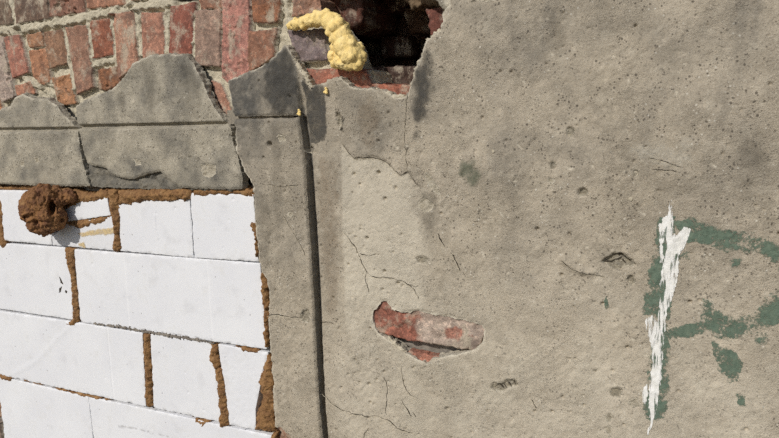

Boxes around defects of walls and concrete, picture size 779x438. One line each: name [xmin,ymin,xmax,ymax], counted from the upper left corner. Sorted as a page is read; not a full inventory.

spalling [331,0,450,84]
crack [340,95,417,185]
flaking render [86,160,233,191]
crack [344,233,419,300]
flaking render [370,301,485,362]